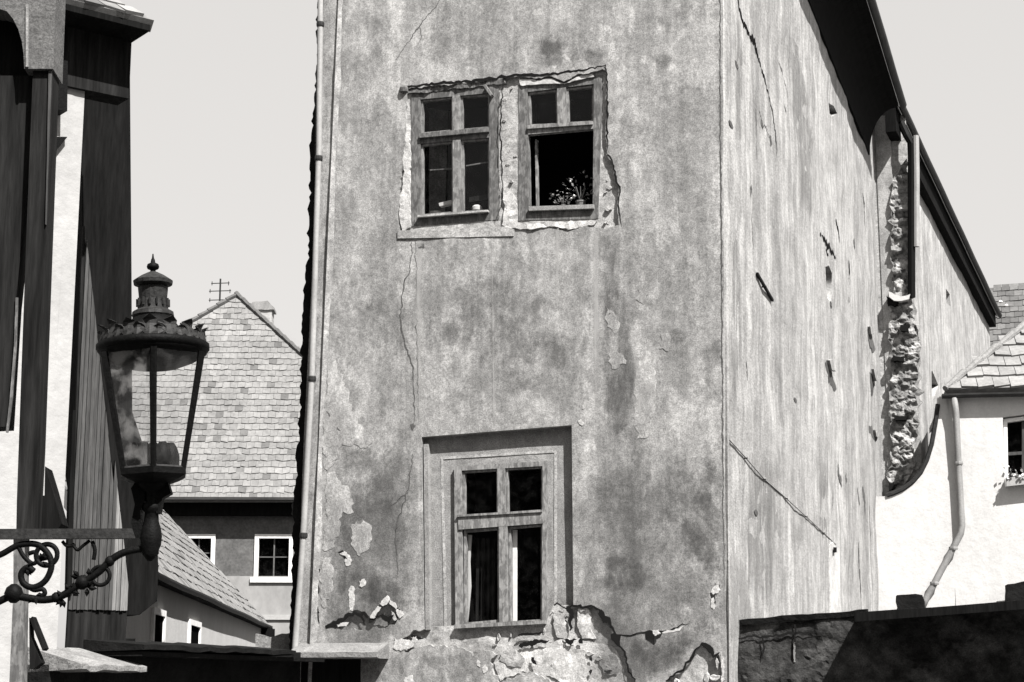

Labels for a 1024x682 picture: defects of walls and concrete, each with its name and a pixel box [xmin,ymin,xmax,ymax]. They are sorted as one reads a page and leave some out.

crack [397,1,439,58]
peeling [400,73,594,94]
peeling [399,123,412,230]
peeling [502,180,612,230]
flaking render [605,308,620,334]
crack [719,0,788,585]
flaking render [869,159,924,491]
crack [392,241,424,580]
flaking render [319,359,374,608]
spalling [331,579,404,631]
spalling [393,605,634,682]
spalling [667,645,725,682]